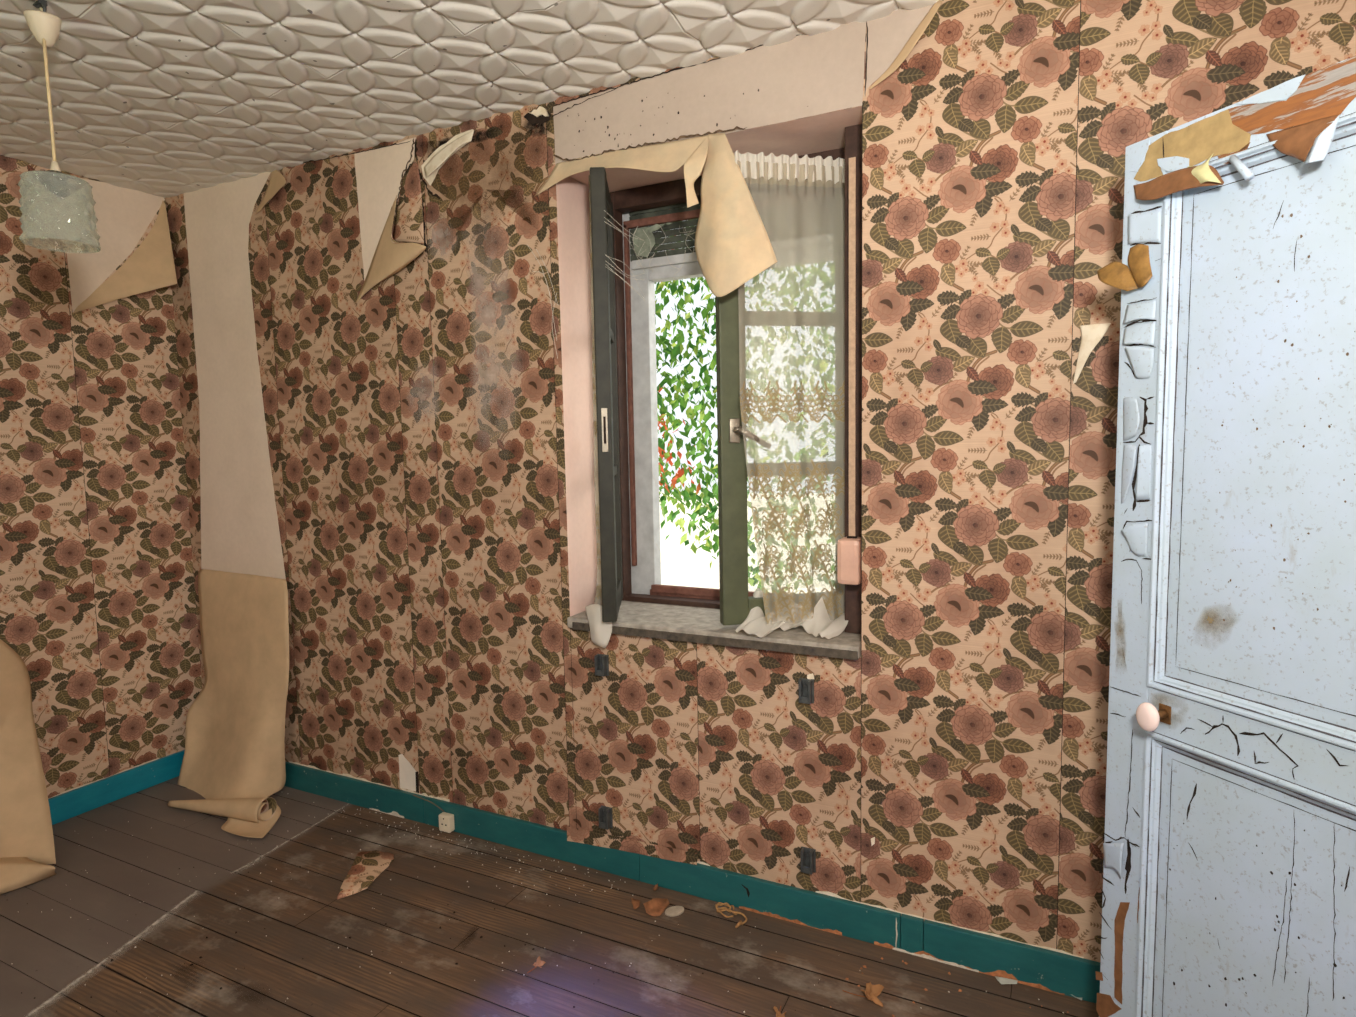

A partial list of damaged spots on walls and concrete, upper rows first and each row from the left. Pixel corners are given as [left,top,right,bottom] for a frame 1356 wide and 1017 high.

peeling [1266,114,1340,164]
peeling [1133,153,1255,200]
peeling [633,223,671,257]
crack [1181,717,1298,780]
crack [1187,783,1198,861]
crack [1273,818,1350,1017]